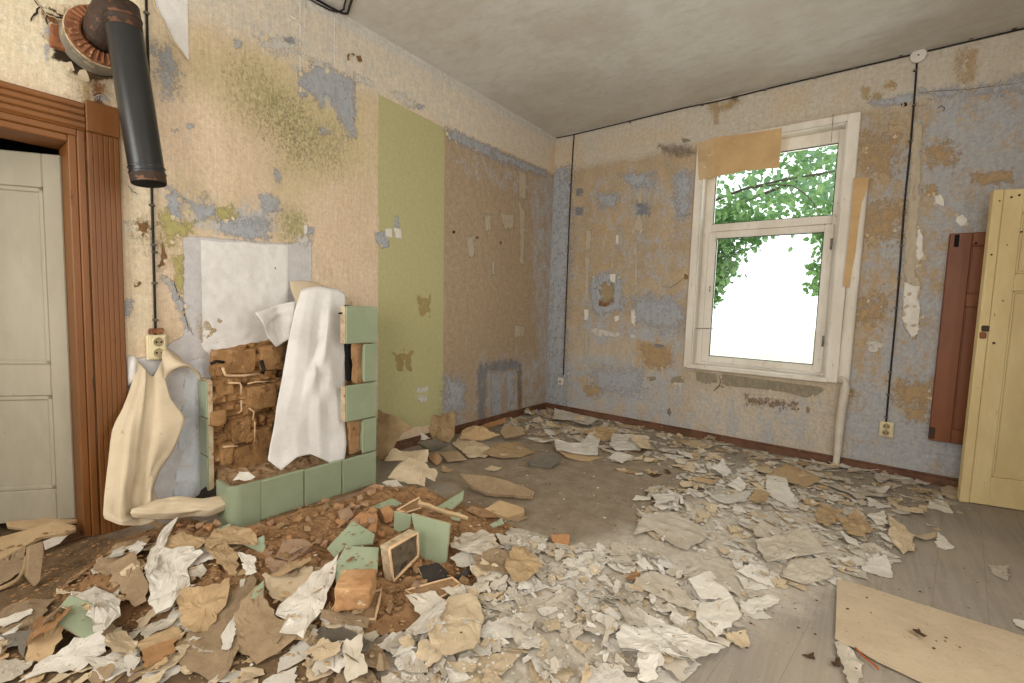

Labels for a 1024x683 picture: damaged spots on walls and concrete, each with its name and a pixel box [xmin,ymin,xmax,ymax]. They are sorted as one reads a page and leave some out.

flaking render [124,186,313,499]
peeling [253,31,374,139]
peeling [445,126,826,406]
flaking render [856,121,944,338]
peeling [890,374,933,424]
peeling [971,170,1014,185]